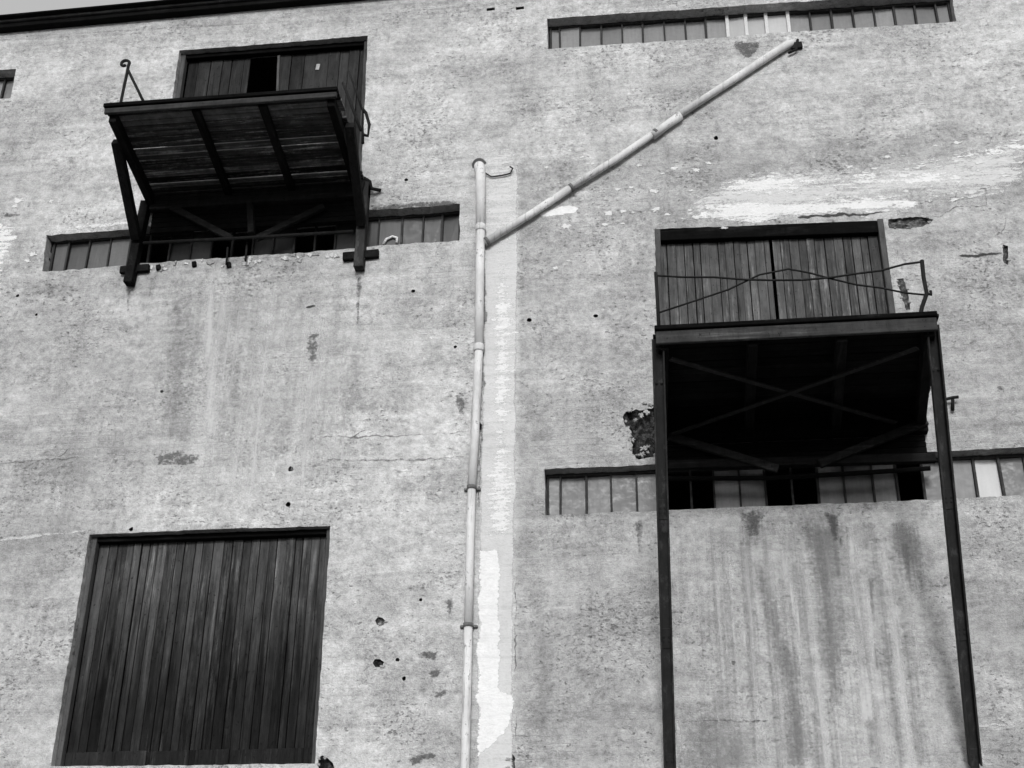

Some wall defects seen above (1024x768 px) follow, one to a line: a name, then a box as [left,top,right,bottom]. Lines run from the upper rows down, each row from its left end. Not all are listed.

peeling [540,205,578,229]
peeling [650,137,1024,229]
peeling [478,148,521,695]
spalling [623,401,655,459]
leakage [742,511,760,535]
leakage [807,514,839,684]
leakage [860,632,878,720]
peeling [477,713,515,768]